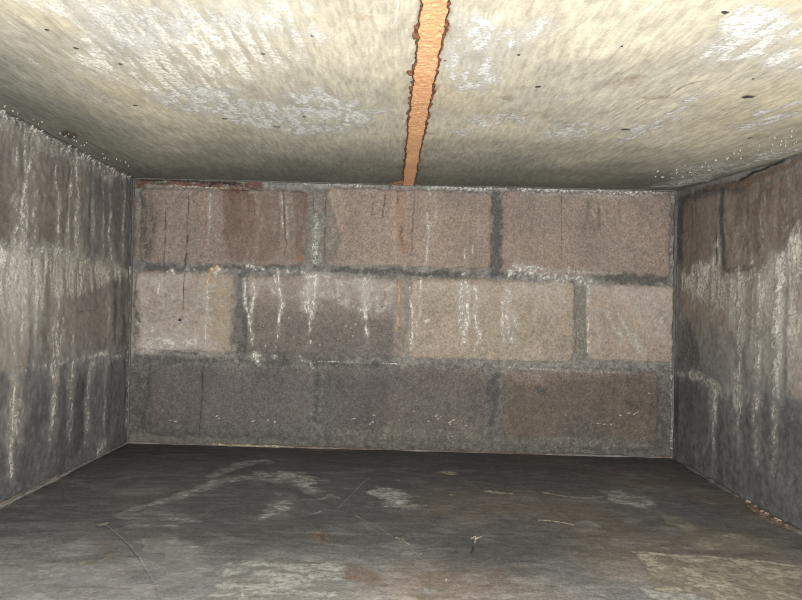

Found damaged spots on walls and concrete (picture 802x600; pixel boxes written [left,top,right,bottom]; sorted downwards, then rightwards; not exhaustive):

leakage [0,110,131,478]
leakage [305,274,422,349]
leakage [459,274,481,350]
leakage [508,266,607,314]
leakage [584,147,802,424]